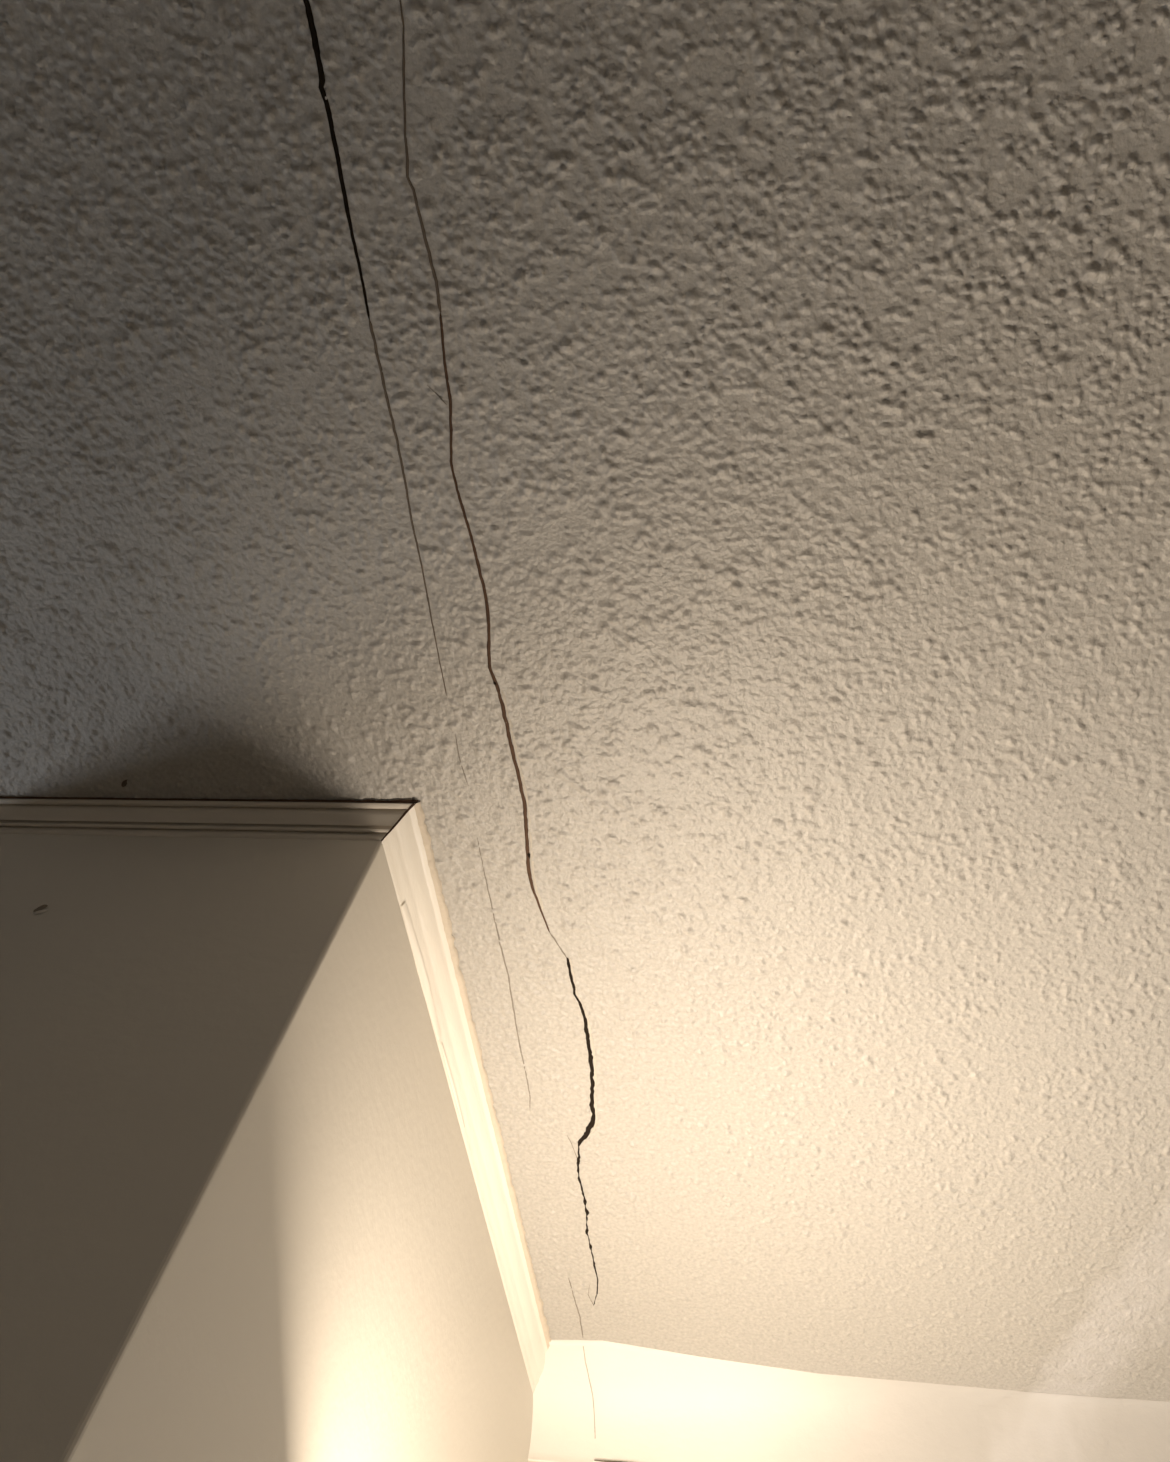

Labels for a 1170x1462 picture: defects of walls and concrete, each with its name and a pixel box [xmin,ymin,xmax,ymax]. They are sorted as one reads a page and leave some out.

crack [303,0,447,696]
crack [399,0,622,1462]